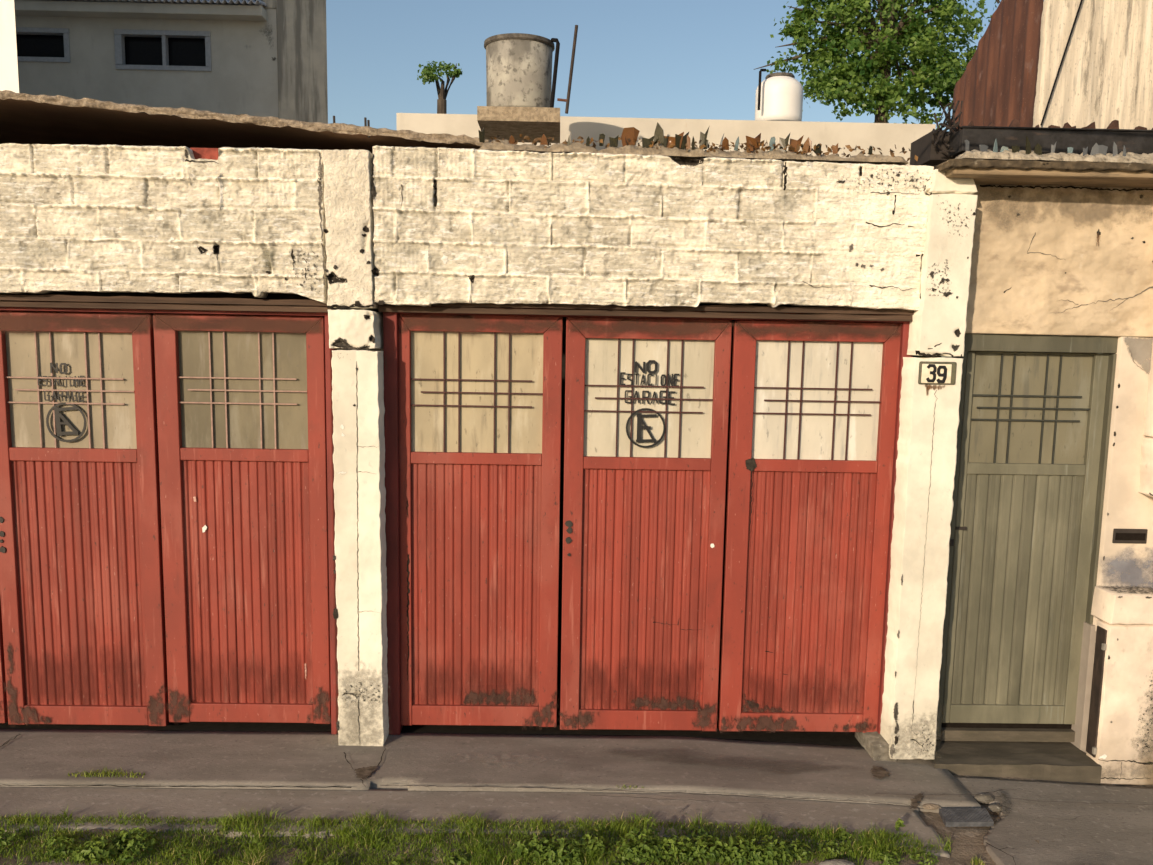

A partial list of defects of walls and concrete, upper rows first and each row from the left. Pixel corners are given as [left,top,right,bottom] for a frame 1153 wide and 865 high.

crack [1057,286,1153,313]
water stain [1106,552,1153,589]